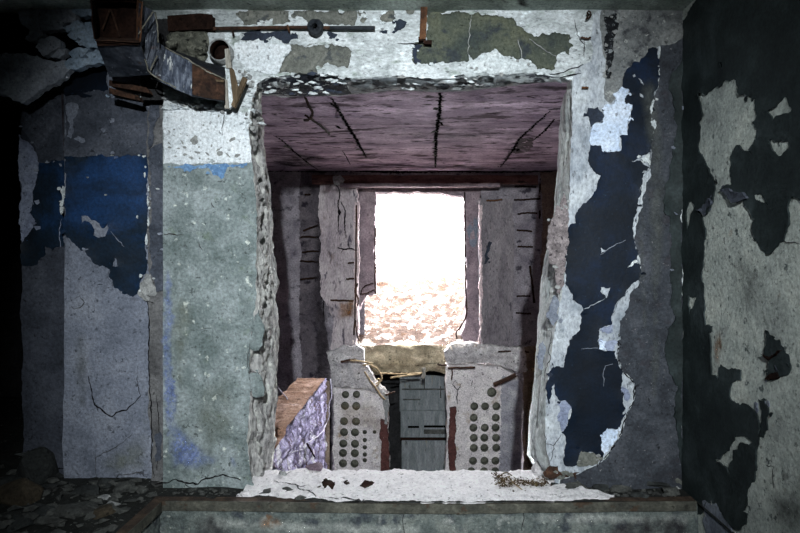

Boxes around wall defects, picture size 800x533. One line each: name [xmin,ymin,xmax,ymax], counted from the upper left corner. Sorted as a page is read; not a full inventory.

peeling [0,9,247,297]
flaking render [234,10,573,135]
crack [268,93,561,253]
peeling [437,13,660,482]
peeling [663,0,800,533]
crack [88,301,241,488]
spalling [140,511,698,533]